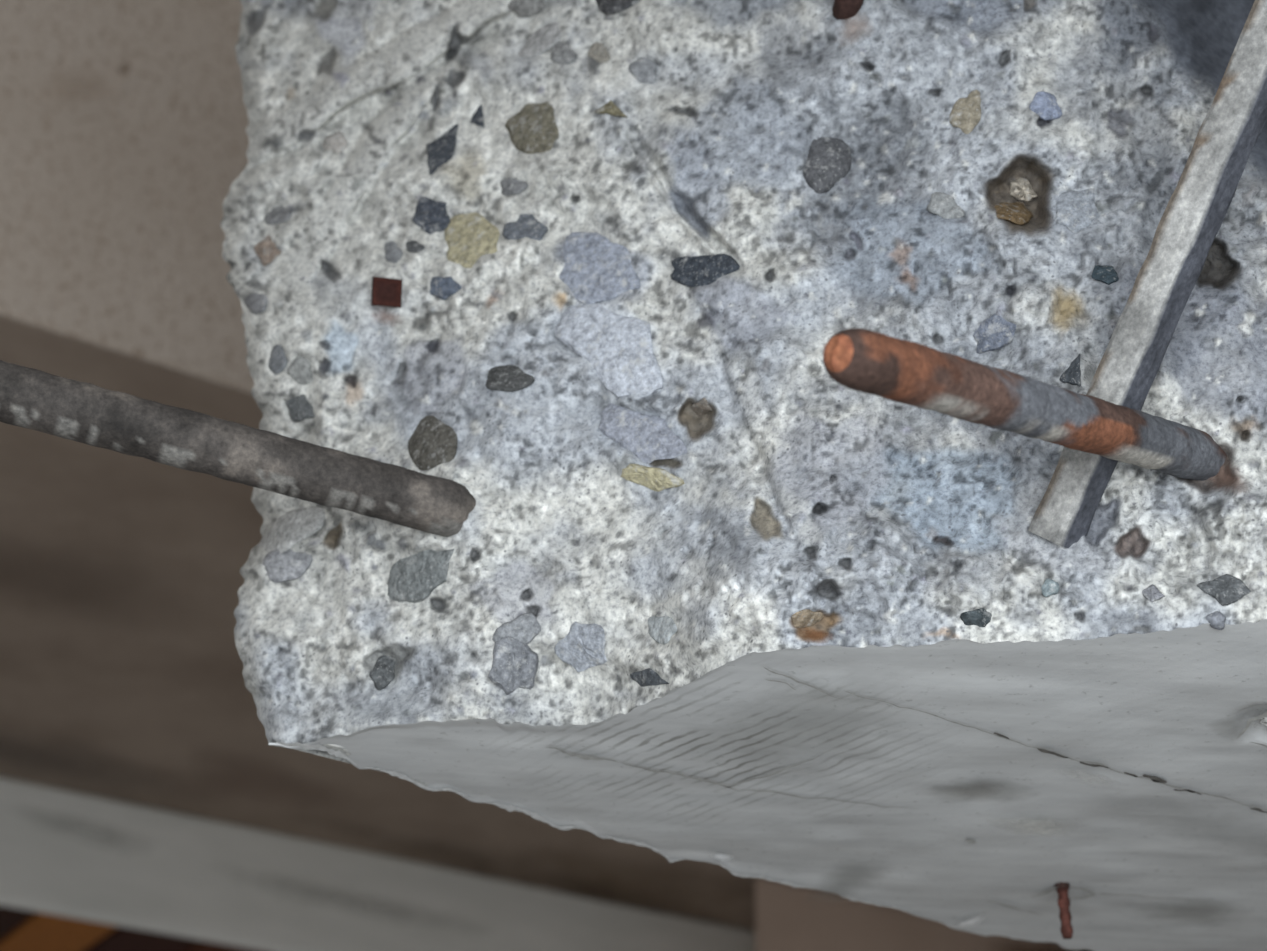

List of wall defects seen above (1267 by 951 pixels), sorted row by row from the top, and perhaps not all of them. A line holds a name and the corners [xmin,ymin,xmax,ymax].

spalling [221,0,1267,916]
corrosion [1216,466,1239,488]
crack [764,667,1267,813]